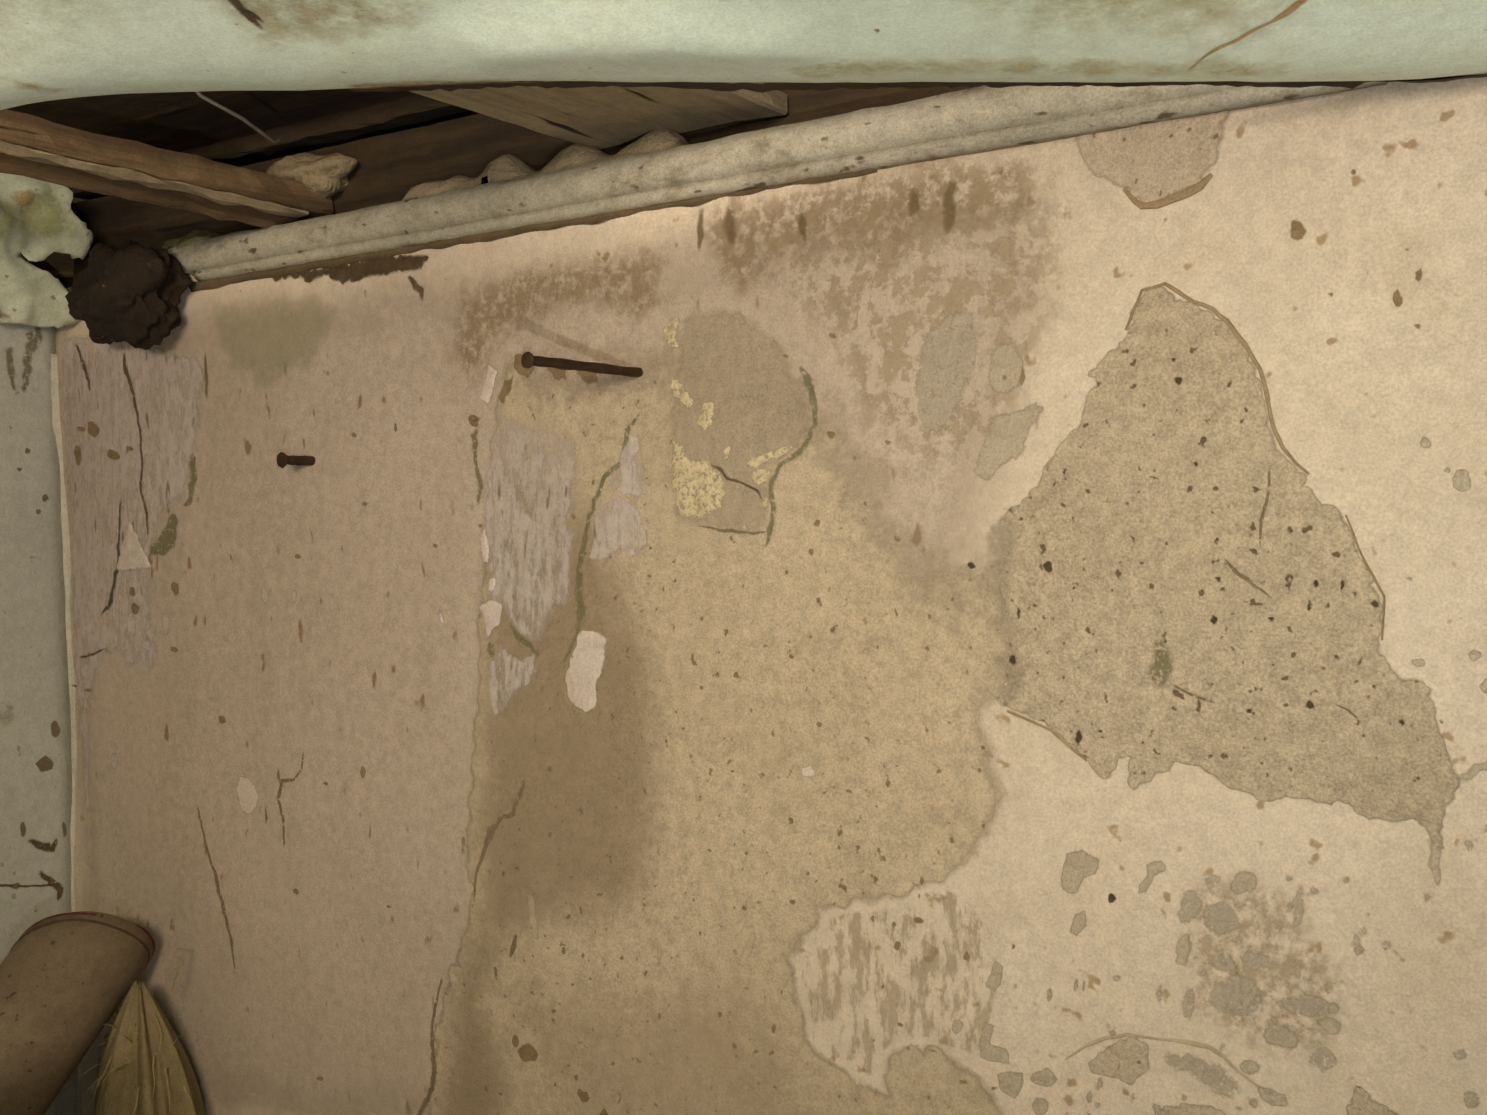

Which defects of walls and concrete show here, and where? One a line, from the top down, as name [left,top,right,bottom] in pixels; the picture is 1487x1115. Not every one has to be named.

peeling [1076,111,1228,210]
peeling [0,173,93,329]
peeling [1291,220,1306,240]
spalling [272,255,428,299]
peeling [1445,468,1471,491]
flaking render [429,282,1460,1115]
peeling [51,721,60,737]
peeling [36,756,53,772]
crack [474,781,525,897]
crack [509,935,517,956]
crack [417,980,442,1115]